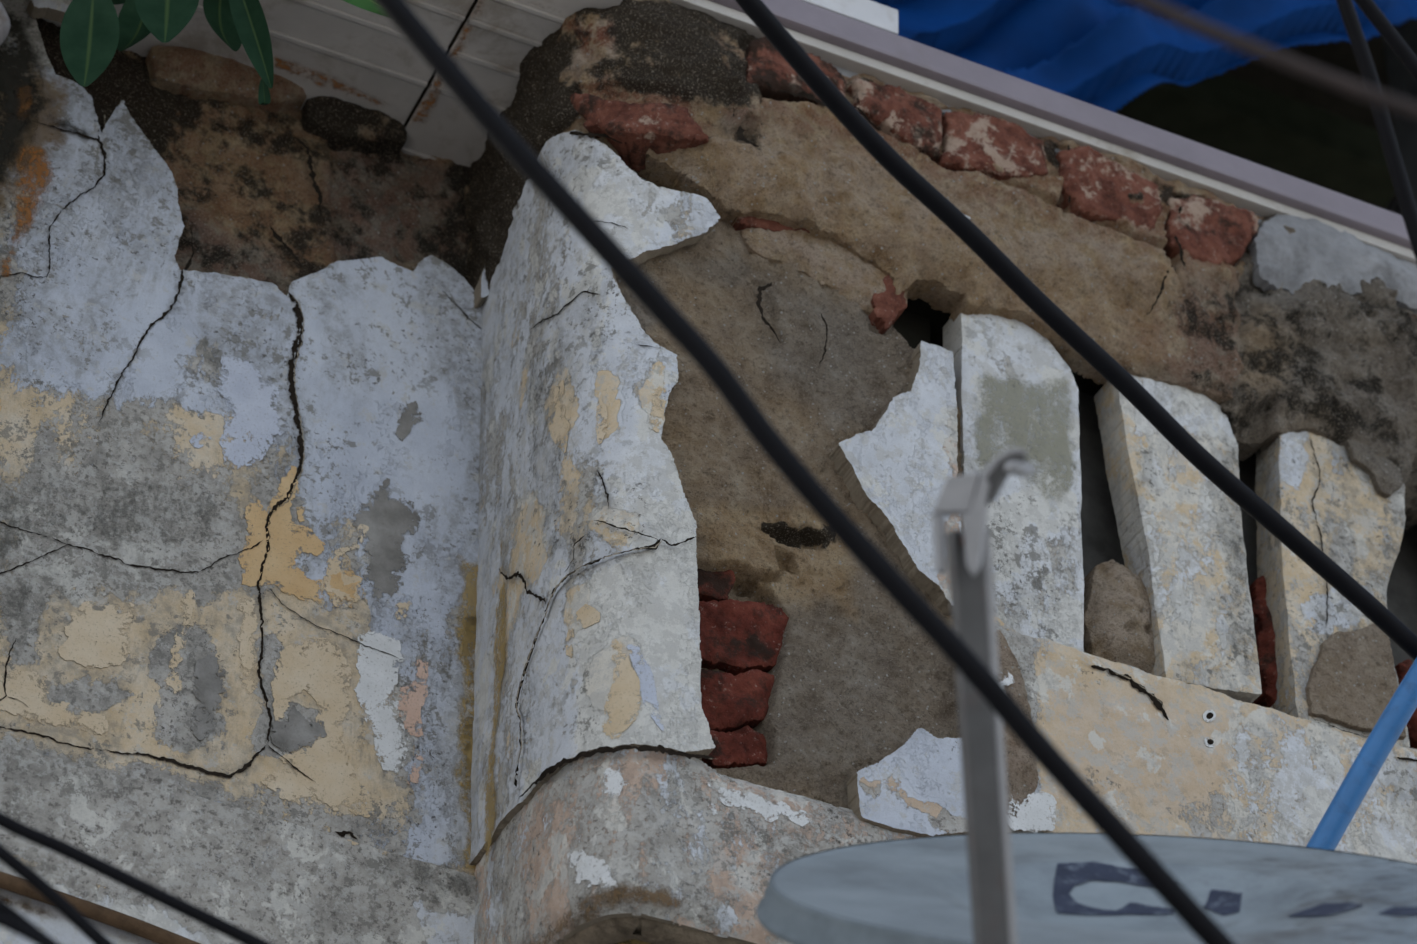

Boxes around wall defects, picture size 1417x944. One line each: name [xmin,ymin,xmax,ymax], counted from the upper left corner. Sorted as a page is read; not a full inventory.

crack [0,103,106,278]
spalling [26,0,527,308]
crack [294,136,323,216]
spalling [500,0,1107,628]
spalling [807,53,1417,530]
peeling [0,655,109,735]
peeling [58,601,136,669]
crack [0,226,396,781]
peeling [164,465,429,818]
crack [499,470,715,797]
flaking render [616,278,960,827]
flaking render [1003,723,1057,833]